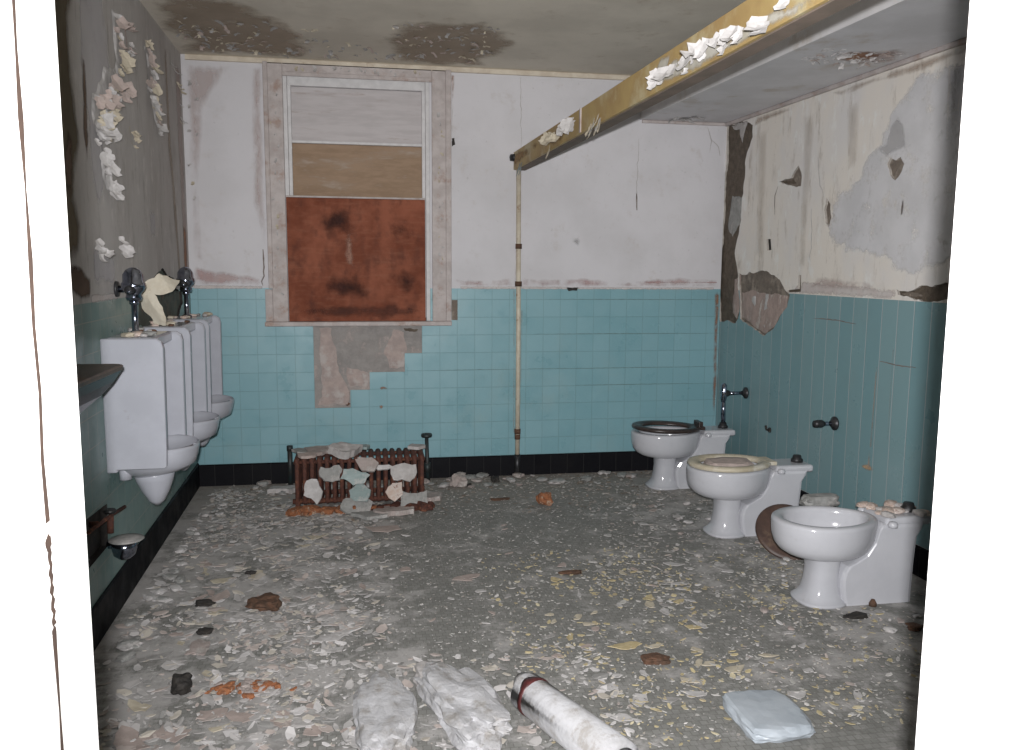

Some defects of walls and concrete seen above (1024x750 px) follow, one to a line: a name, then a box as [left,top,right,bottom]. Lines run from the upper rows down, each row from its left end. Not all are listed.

water stain [164,0,301,56]
water stain [394,25,508,64]
peeling [81,0,169,200]
flaking render [782,168,802,187]
peeling [826,66,965,274]
flaking render [720,121,790,335]
peeling [95,236,136,281]
flaking render [900,283,949,302]
peeling [313,326,422,408]